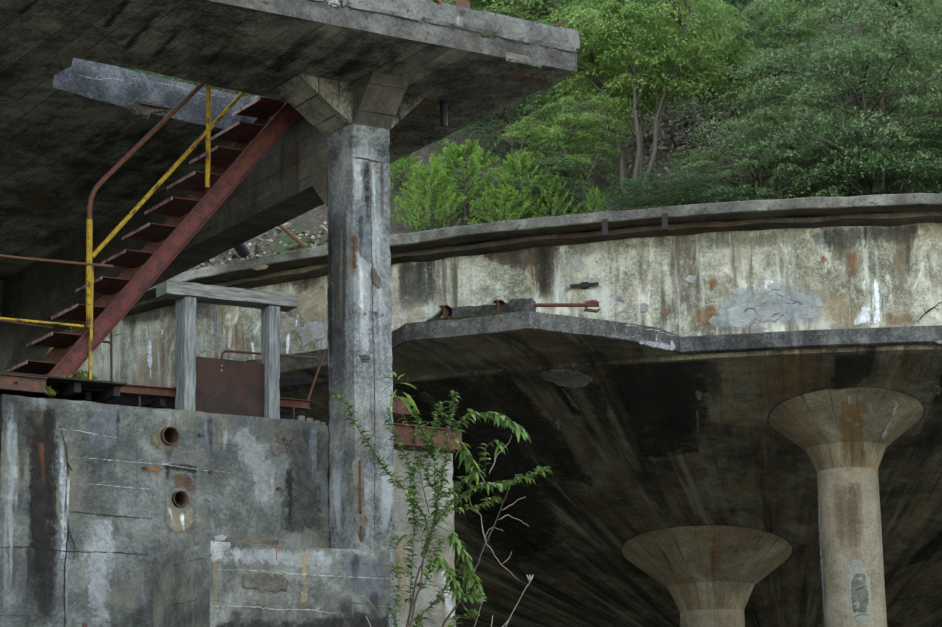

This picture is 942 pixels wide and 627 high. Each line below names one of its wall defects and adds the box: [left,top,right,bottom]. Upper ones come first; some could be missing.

spalling [128,92,172,119]
flaking render [708,282,824,332]
efflorescence [854,279,883,325]
damp [19,405,70,592]
crack [59,425,75,627]
spalling [851,573,869,613]